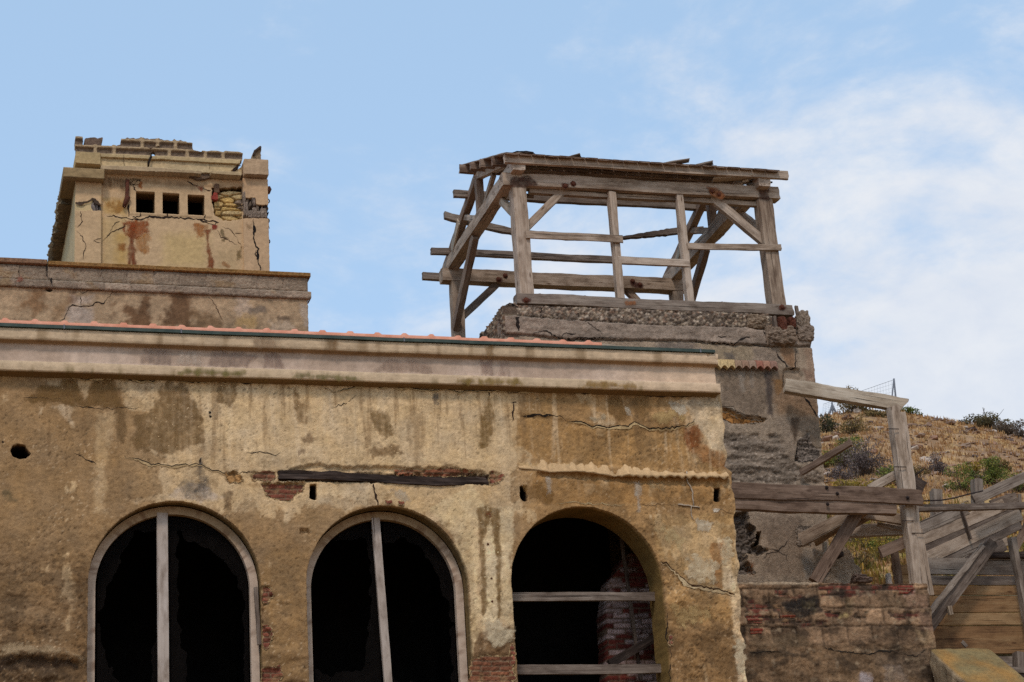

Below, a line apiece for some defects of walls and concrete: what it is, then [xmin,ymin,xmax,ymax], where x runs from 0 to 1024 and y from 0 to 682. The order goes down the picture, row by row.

rust [112,202,149,265]
crack [80,154,261,270]
rust [194,223,229,268]
spalling [211,183,269,221]
crack [62,290,114,320]
damp [26,379,203,453]
crack [326,387,697,432]
crack [129,451,281,474]
spalling [225,470,305,501]
spalling [394,467,505,485]
damp [478,506,501,619]
spalling [662,509,766,596]